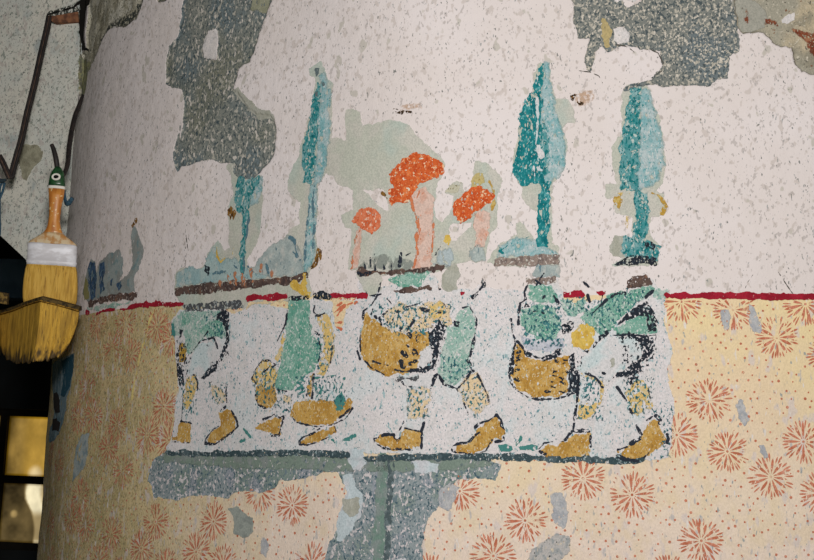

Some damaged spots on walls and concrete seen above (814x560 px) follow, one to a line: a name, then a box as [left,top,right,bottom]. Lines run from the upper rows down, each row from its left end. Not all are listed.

flaking render [78,0,143,97]
flaking render [166,0,576,310]
flaking render [572,0,814,267]
flaking render [147,448,501,560]